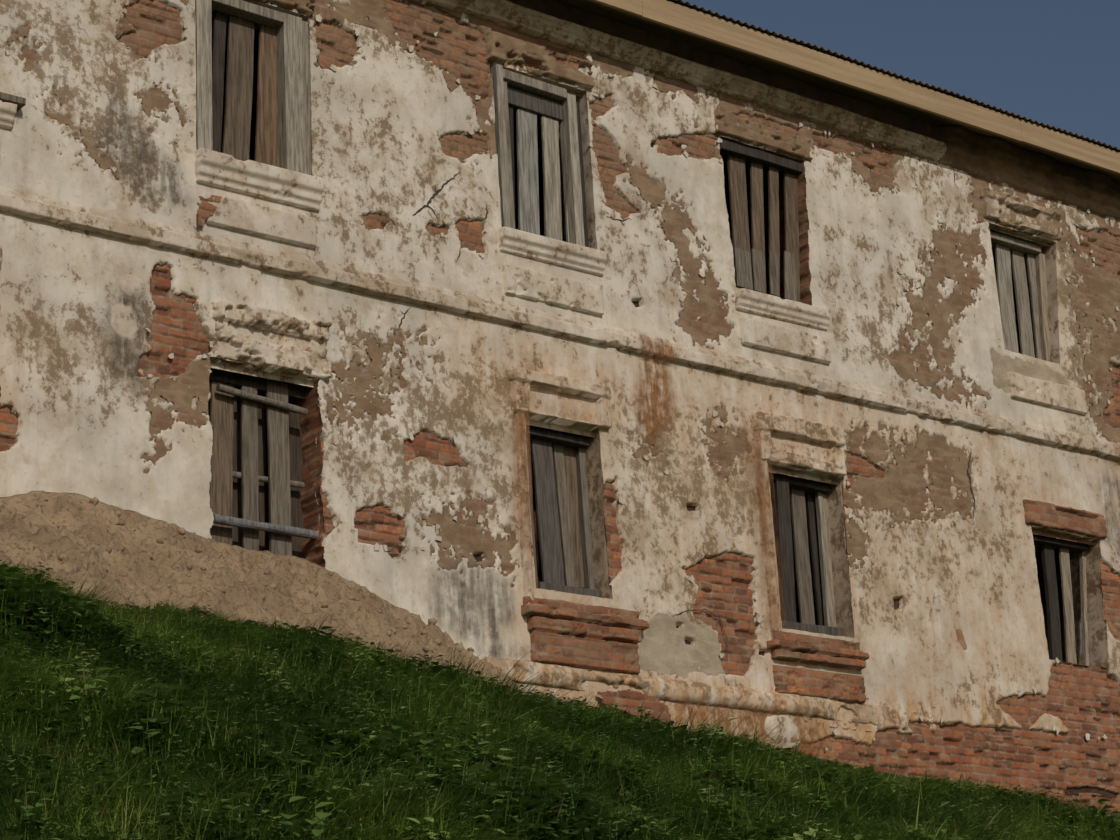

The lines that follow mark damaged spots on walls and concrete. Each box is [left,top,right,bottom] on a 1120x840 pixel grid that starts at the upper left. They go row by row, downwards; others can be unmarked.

peeling [36,85,125,179]
flaking render [114,0,195,132]
flaking render [135,258,213,474]
flaking render [197,195,222,226]
peeling [319,315,467,467]
crack [413,172,460,218]
flaking render [425,218,487,259]
peeling [589,92,734,349]
peeling [883,175,1120,443]
peeling [842,421,977,574]
flaking render [682,552,765,676]
flaking render [782,657,1120,816]